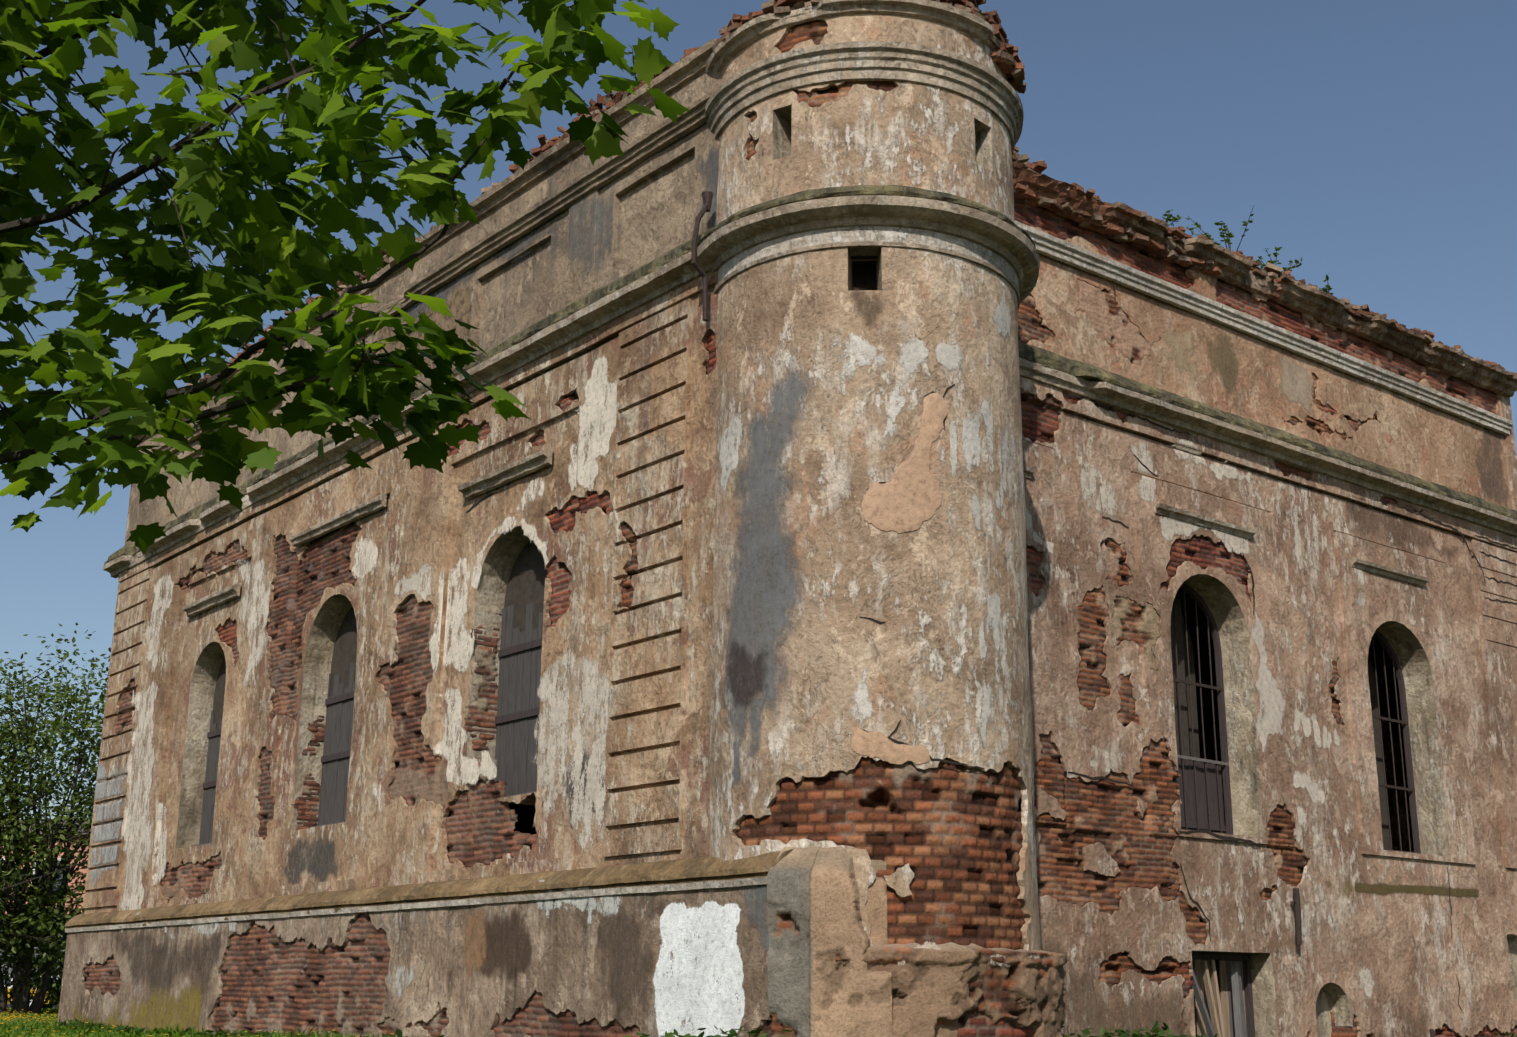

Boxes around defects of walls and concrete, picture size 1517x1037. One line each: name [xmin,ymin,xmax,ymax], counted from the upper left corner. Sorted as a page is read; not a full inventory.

spalling [1012,146,1517,415]
spalling [1020,390,1133,444]
spalling [90,522,378,910]
spalling [373,356,642,869]
leakage [719,369,806,783]
spalling [1077,538,1161,727]
spalling [1131,439,1343,752]
spalling [736,732,1208,950]
spalling [1259,771,1326,900]
spalling [83,957,121,998]
spalling [208,913,449,1037]
spalling [1098,952,1193,1035]